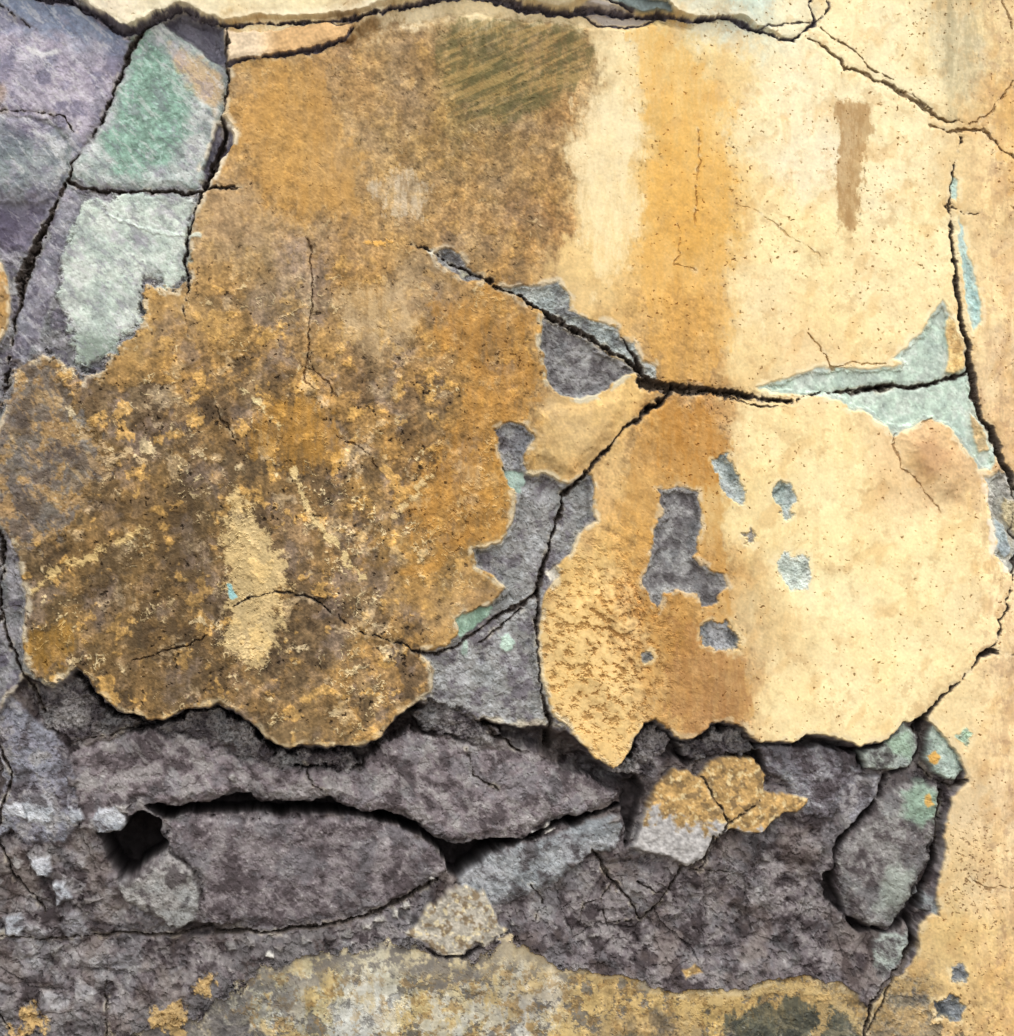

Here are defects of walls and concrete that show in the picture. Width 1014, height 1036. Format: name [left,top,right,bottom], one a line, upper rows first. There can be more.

spalling [0,0,228,687]
crack [0,0,1014,751]
spalling [425,420,599,652]
spalling [641,485,742,654]
peeling [710,452,748,507]
peeling [740,527,759,547]
peeling [774,549,814,593]
peeling [754,176,1014,573]
spalling [0,601,971,1036]
crack [862,944,917,1036]